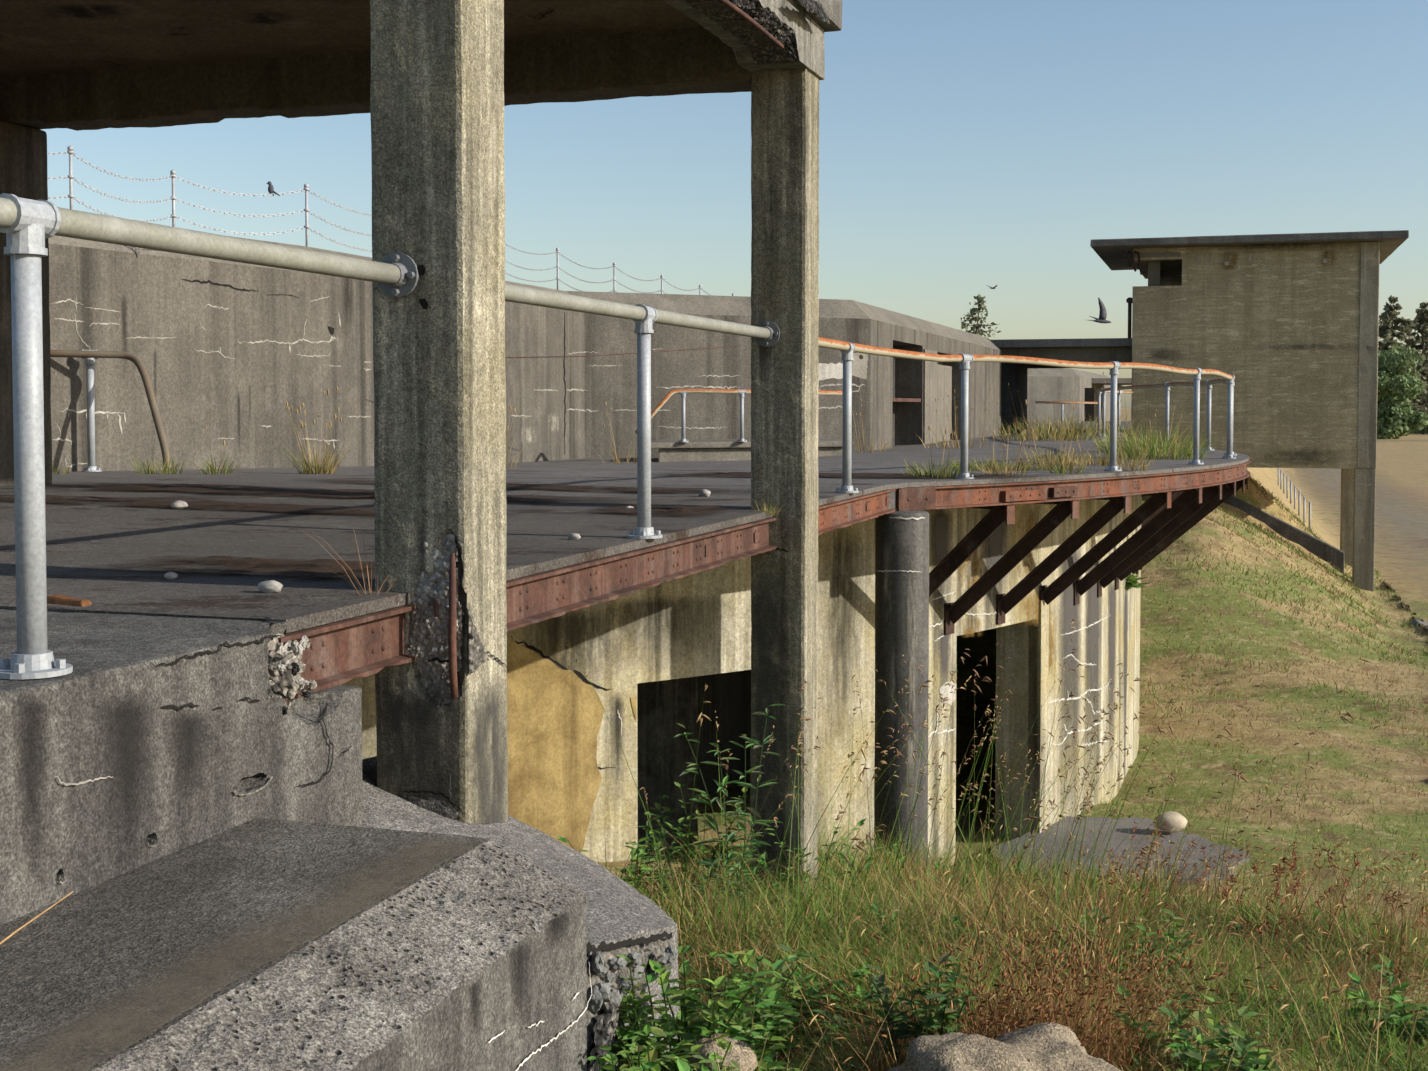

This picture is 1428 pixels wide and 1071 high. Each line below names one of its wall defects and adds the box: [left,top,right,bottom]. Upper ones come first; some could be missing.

spalling [685,0,801,65]
crack [51,279,371,371]
water stain [26,704,41,810]
water stain [115,704,141,818]
water stain [181,718,200,779]
crack [162,697,260,711]
spalling [267,634,317,715]
crack [298,695,351,787]
spalling [407,534,489,707]
crack [426,636,622,734]
peeling [507,638,605,853]
water stain [540,617,586,670]